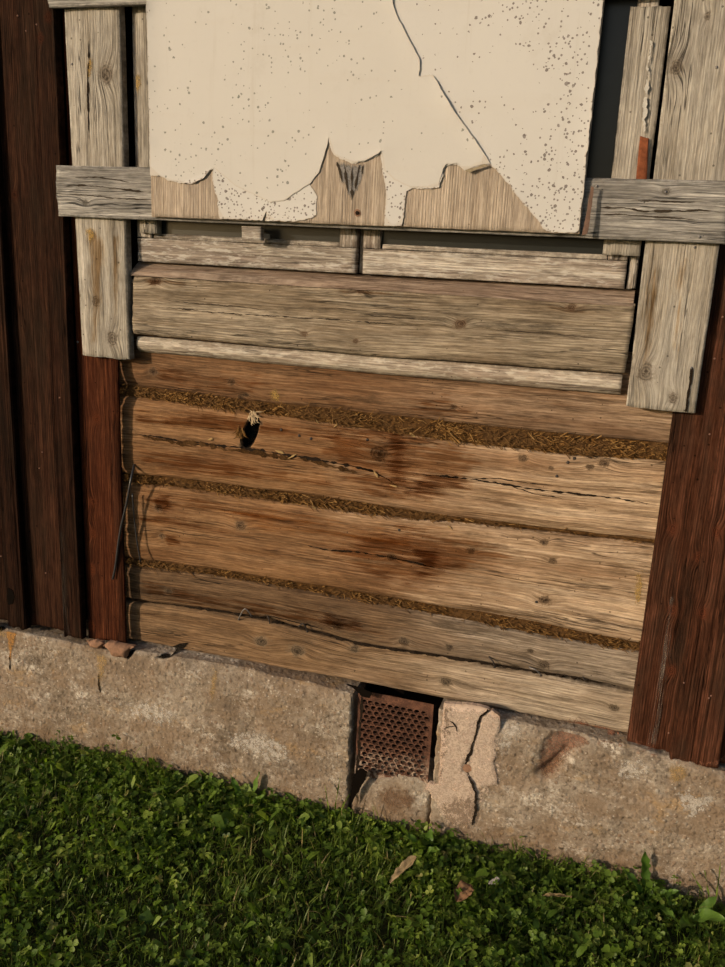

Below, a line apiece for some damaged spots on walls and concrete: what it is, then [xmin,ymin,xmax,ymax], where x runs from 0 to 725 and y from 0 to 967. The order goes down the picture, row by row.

peeling [146,0,603,235]
crack [132,433,390,481]
crack [420,474,652,505]
crack [445,709,489,825]